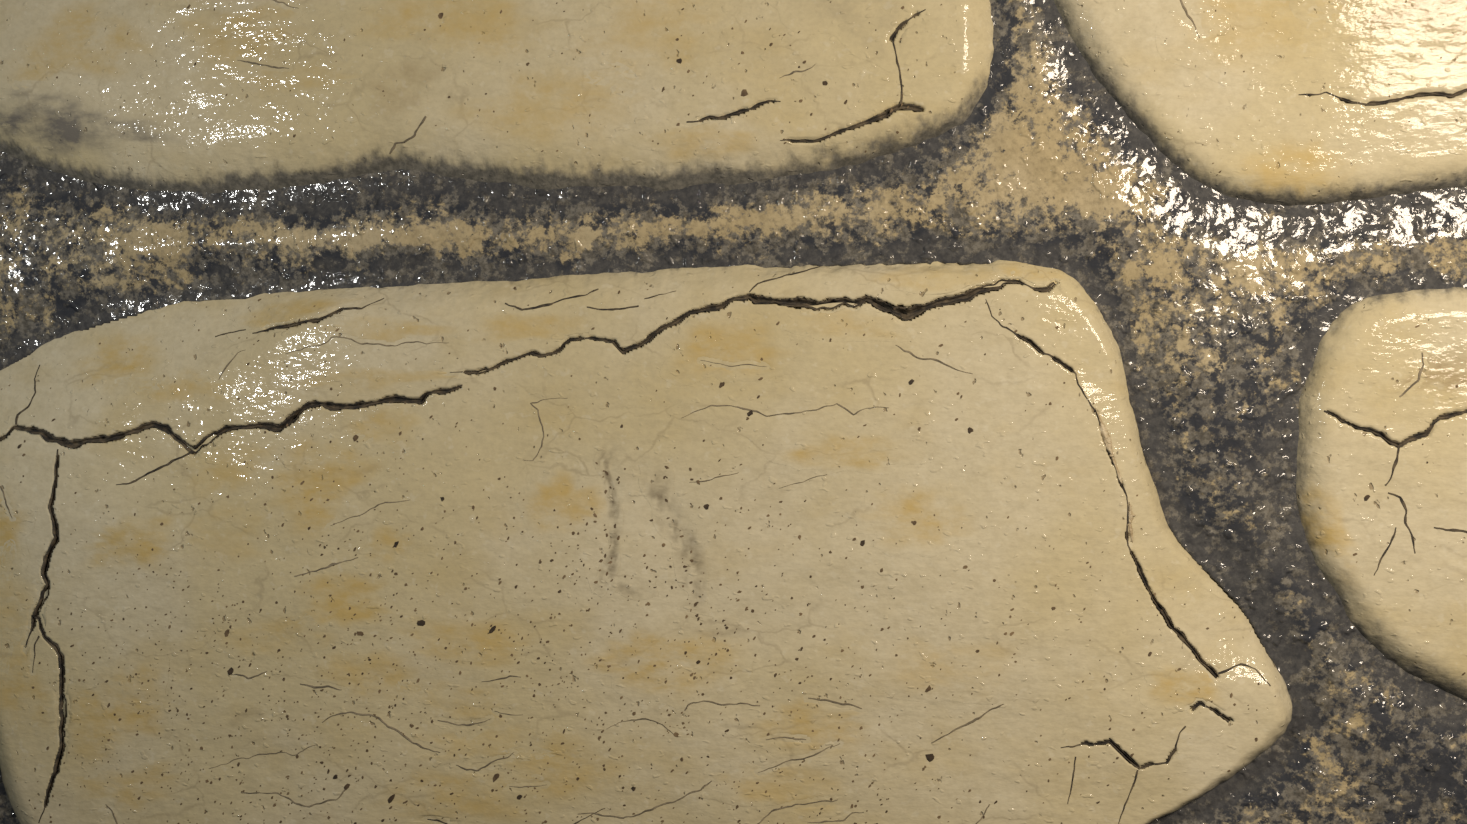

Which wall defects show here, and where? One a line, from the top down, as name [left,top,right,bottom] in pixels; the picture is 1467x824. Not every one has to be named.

crack [687,64,815,123]
crack [780,9,926,143]
crack [1299,88,1467,106]
crack [1399,352,1424,397]
crack [0,266,1271,824]
crack [1324,410,1467,576]